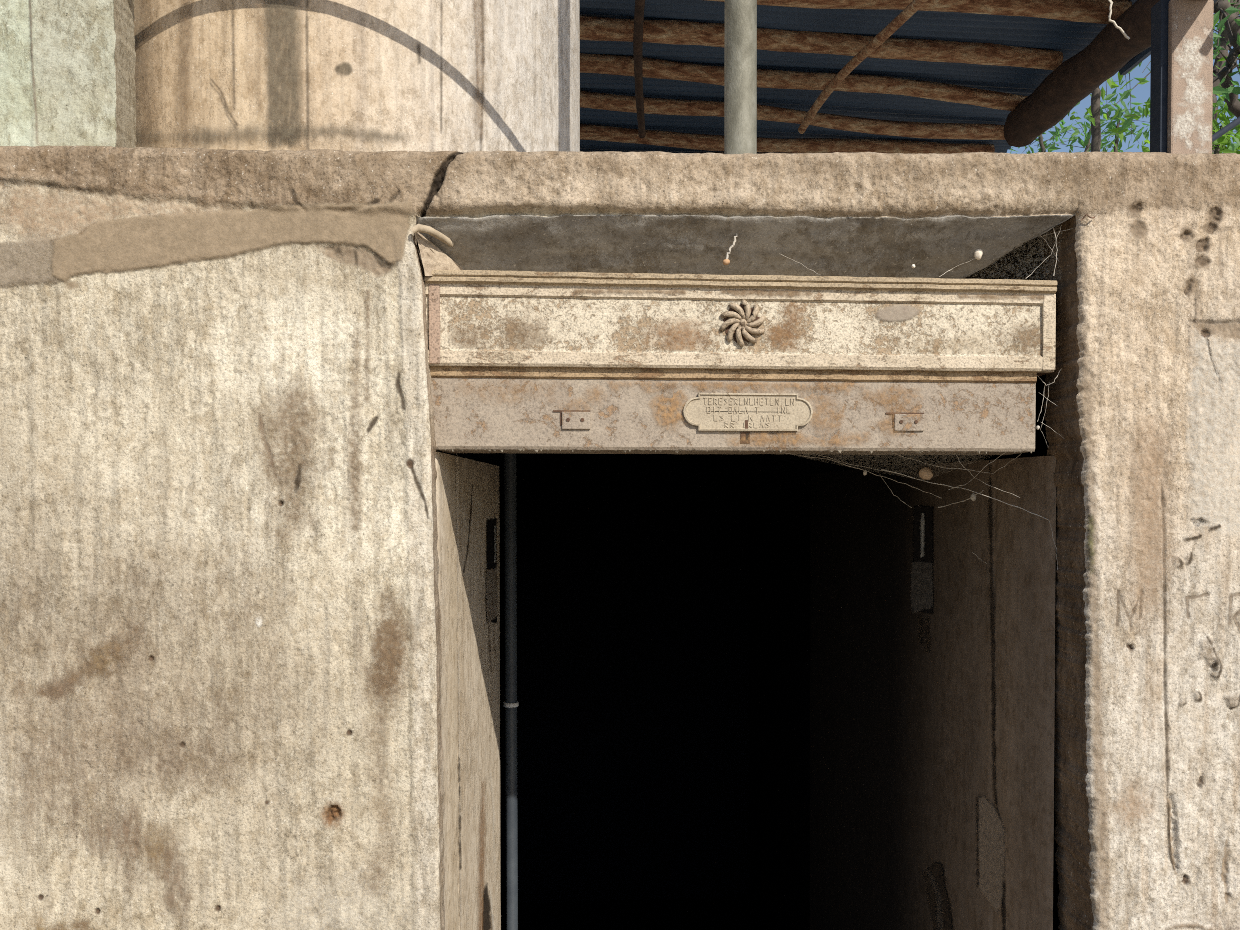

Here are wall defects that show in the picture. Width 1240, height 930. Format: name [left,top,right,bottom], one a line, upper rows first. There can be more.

water stain [266,0,309,145]
crack [421,0,485,218]
water stain [370,619,407,694]